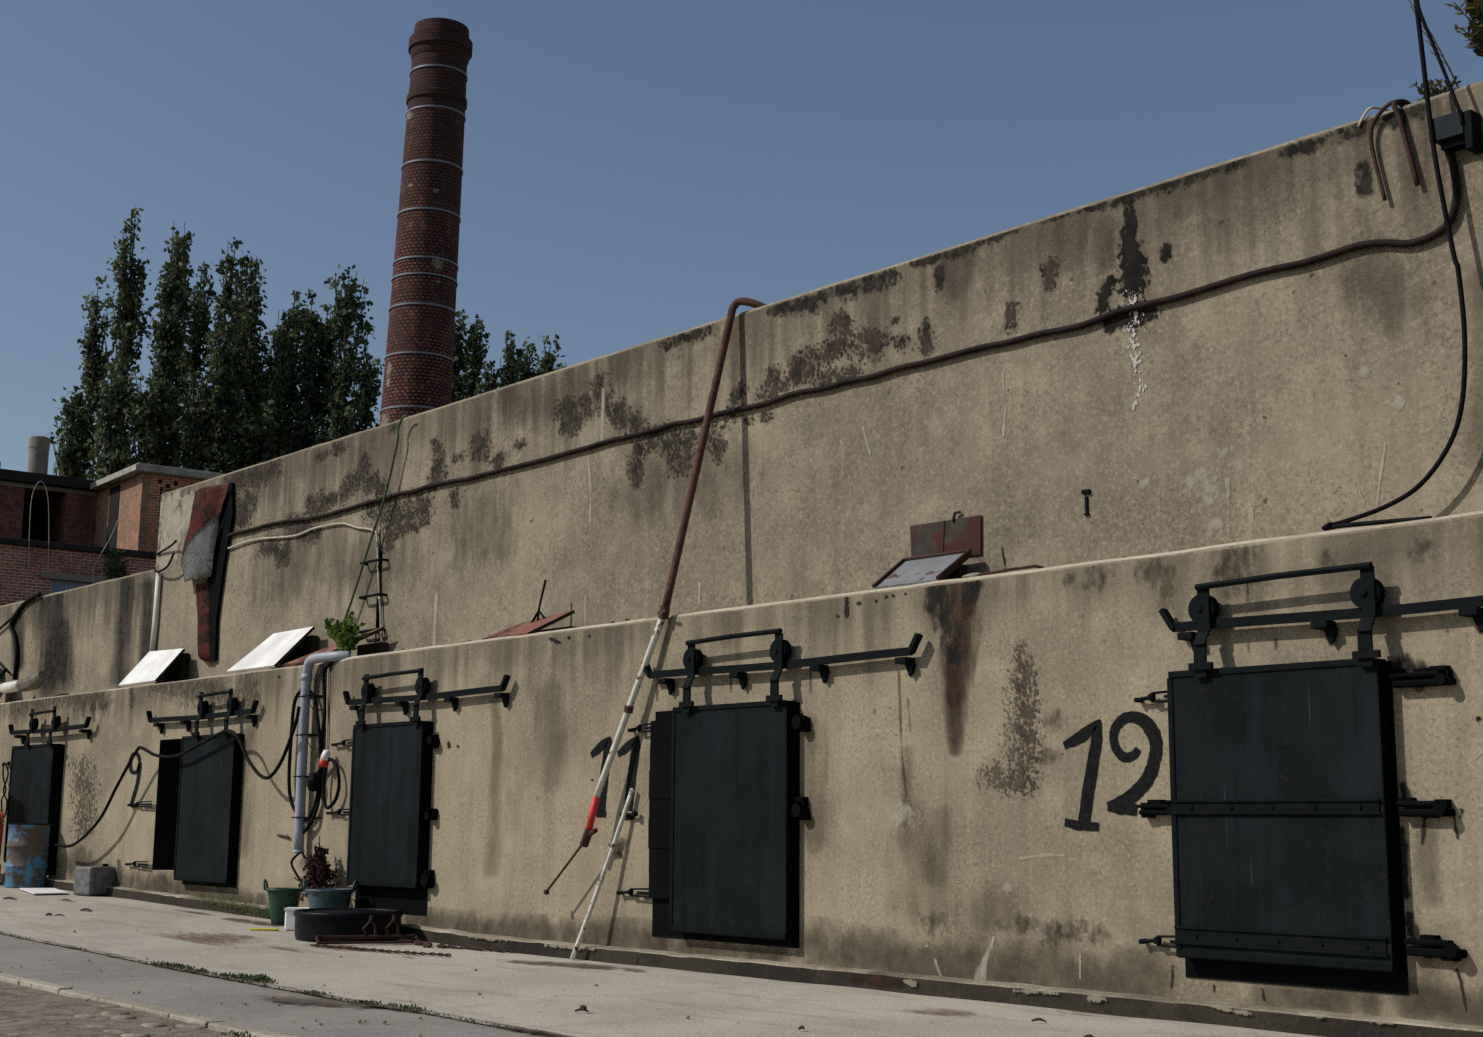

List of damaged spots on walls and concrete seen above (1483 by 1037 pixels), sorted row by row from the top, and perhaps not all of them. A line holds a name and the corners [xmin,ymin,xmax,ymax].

damp [933,263,945,292]
damp [1004,301,1021,335]
damp [1039,255,1059,292]
damp [1045,158,1248,411]
damp [550,307,936,490]
damp [224,428,526,569]
corrosion [944,582,980,753]